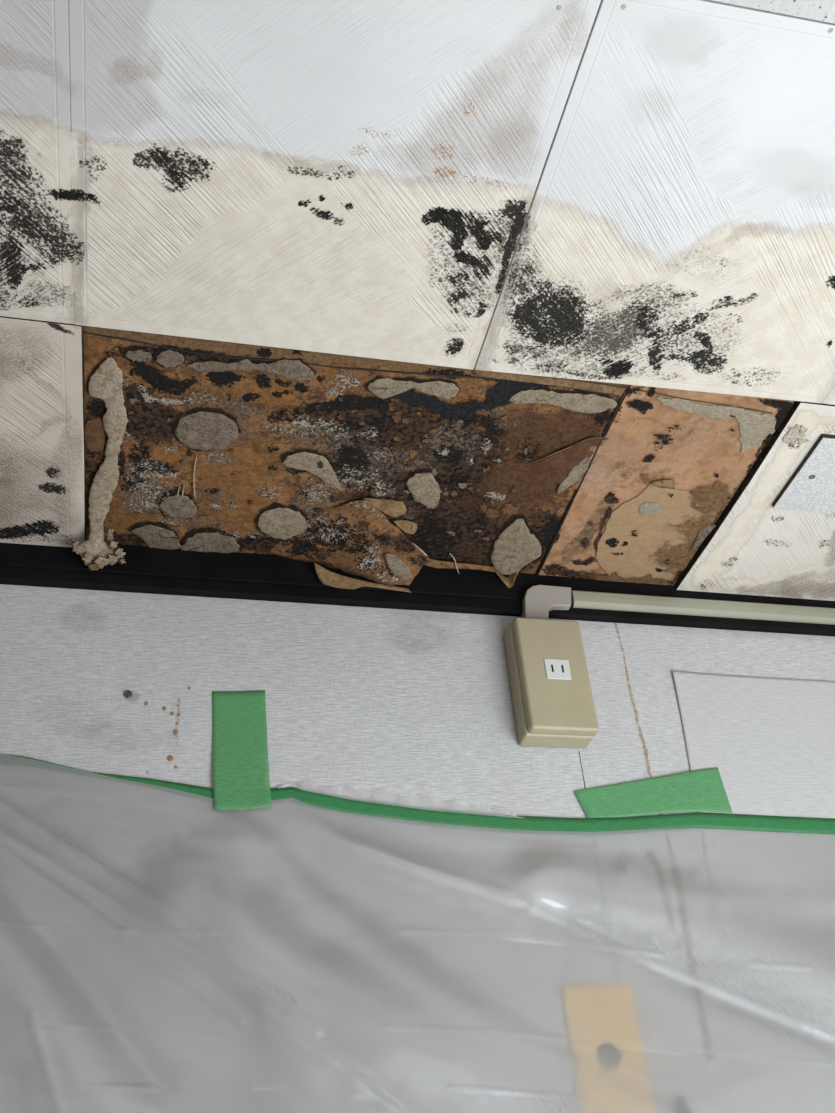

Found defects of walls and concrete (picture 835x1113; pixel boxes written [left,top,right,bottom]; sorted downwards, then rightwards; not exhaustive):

water stain [0,115,835,598]
spalling [72,357,141,571]
peeling [443,482,494,506]